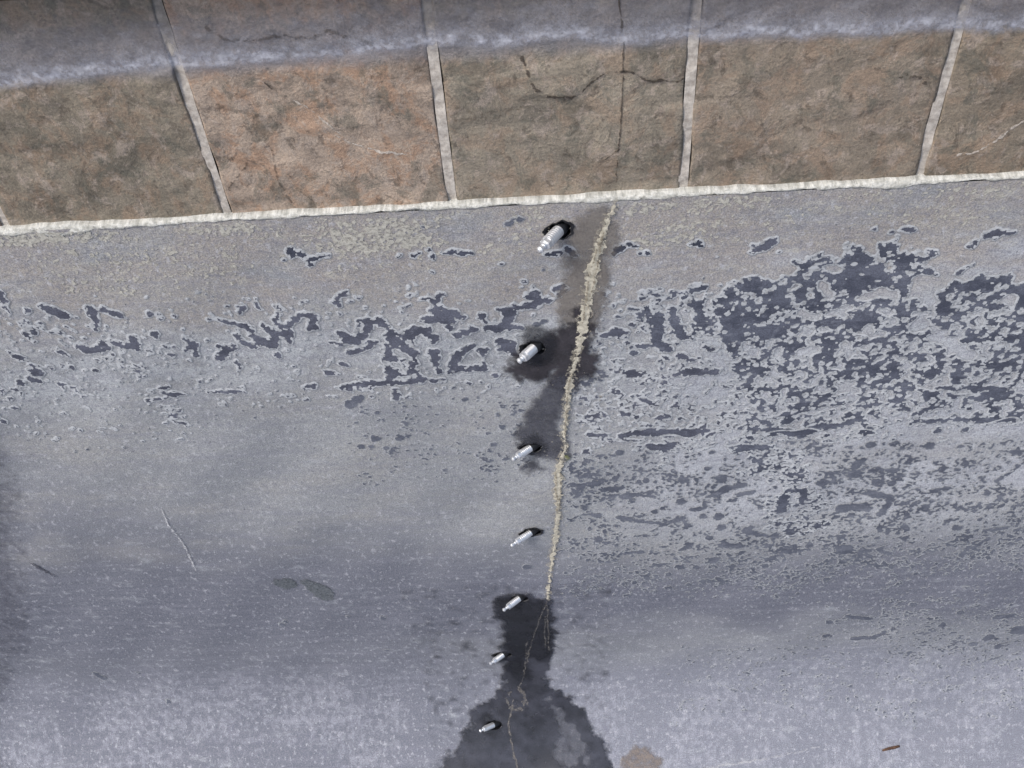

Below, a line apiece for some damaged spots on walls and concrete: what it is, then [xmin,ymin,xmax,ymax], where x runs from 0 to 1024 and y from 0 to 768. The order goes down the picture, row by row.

crack [520,0,684,176]
peeling [0,278,570,486]
peeling [280,245,332,268]
peeling [395,247,475,274]
peeling [541,244,579,271]
leakage [504,181,1024,472]
crack [506,205,616,768]
peeling [551,225,1024,729]
leakage [443,594,613,768]